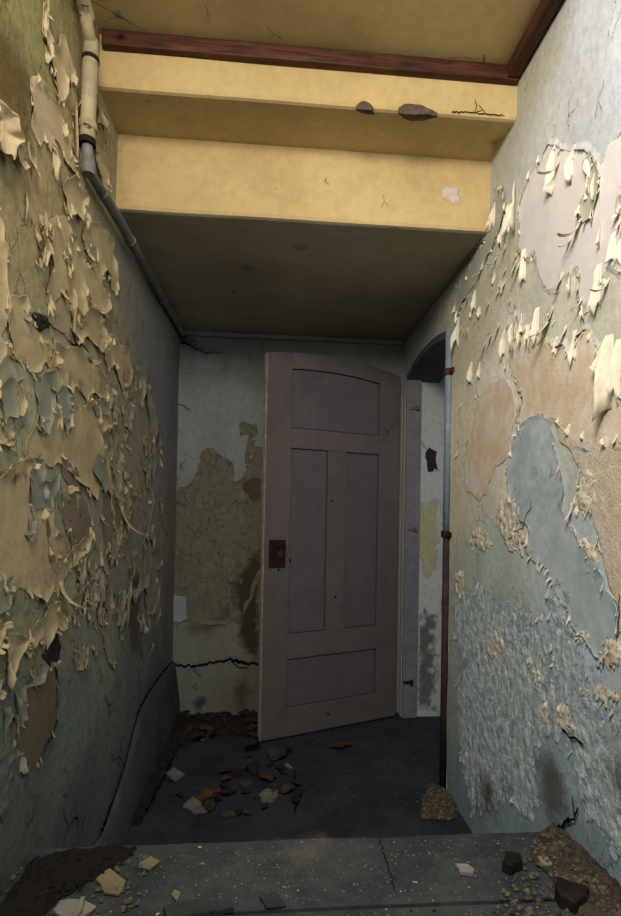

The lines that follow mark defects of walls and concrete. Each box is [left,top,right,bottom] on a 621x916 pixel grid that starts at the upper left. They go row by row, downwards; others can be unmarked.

peeling [0,0,263,782]
peeling [450,129,621,672]
flaking render [424,448,439,472]
damp [237,554,261,653]
flaking render [538,699,574,732]
flaking render [580,684,621,736]
crack [62,657,259,843]
crack [557,798,579,829]
crack [379,839,397,895]